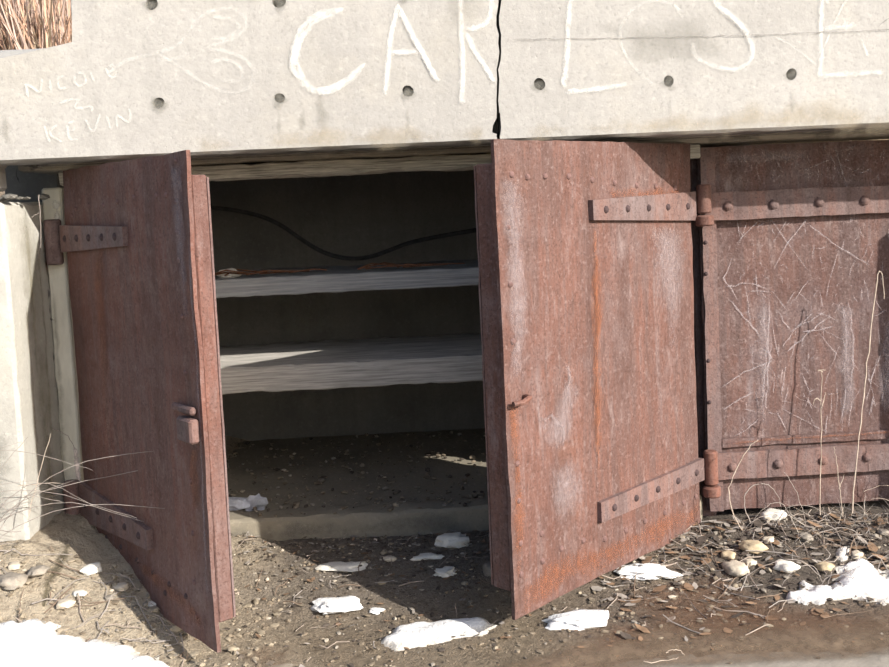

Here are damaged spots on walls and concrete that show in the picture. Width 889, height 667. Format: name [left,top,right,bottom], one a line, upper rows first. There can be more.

crack [494,0,502,137]